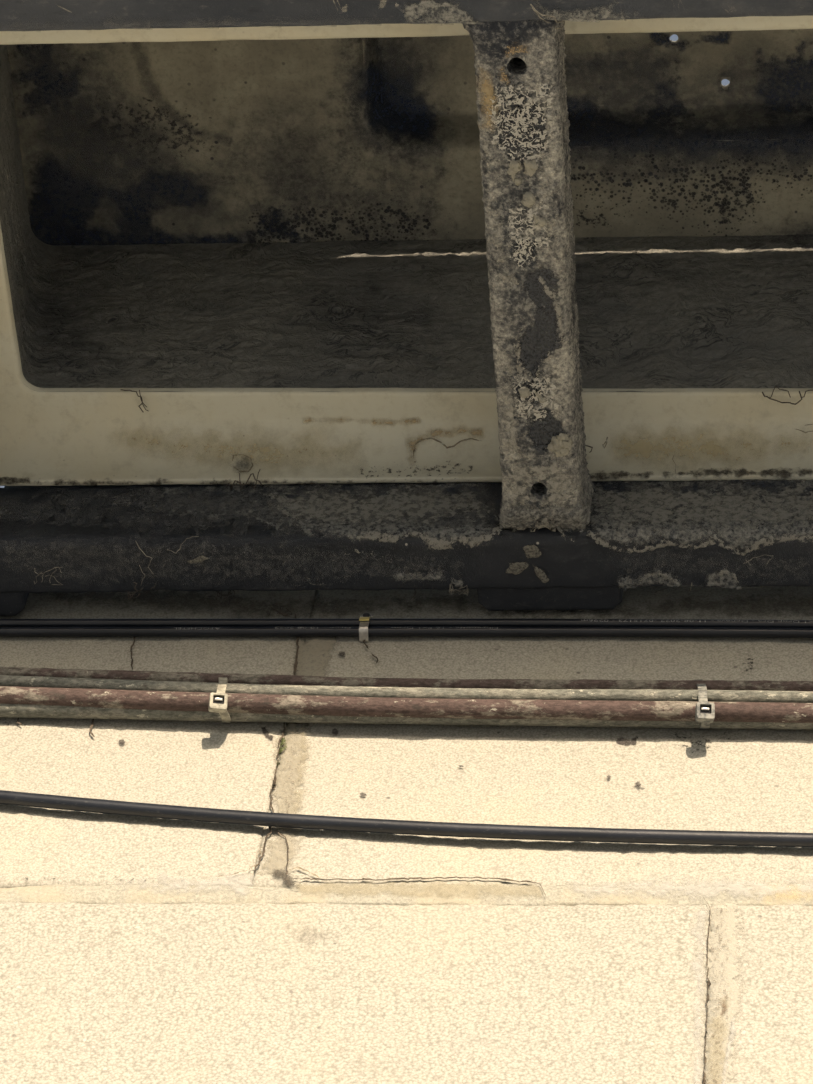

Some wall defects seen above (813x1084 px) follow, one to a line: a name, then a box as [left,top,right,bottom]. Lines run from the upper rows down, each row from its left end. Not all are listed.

water stain [11,38,436,245]
water stain [478,31,813,285]
water stain [498,276,576,506]
water stain [244,483,490,536]
peeling [130,480,813,583]
crack [218,723,546,896]
crack [703,899,711,1084]